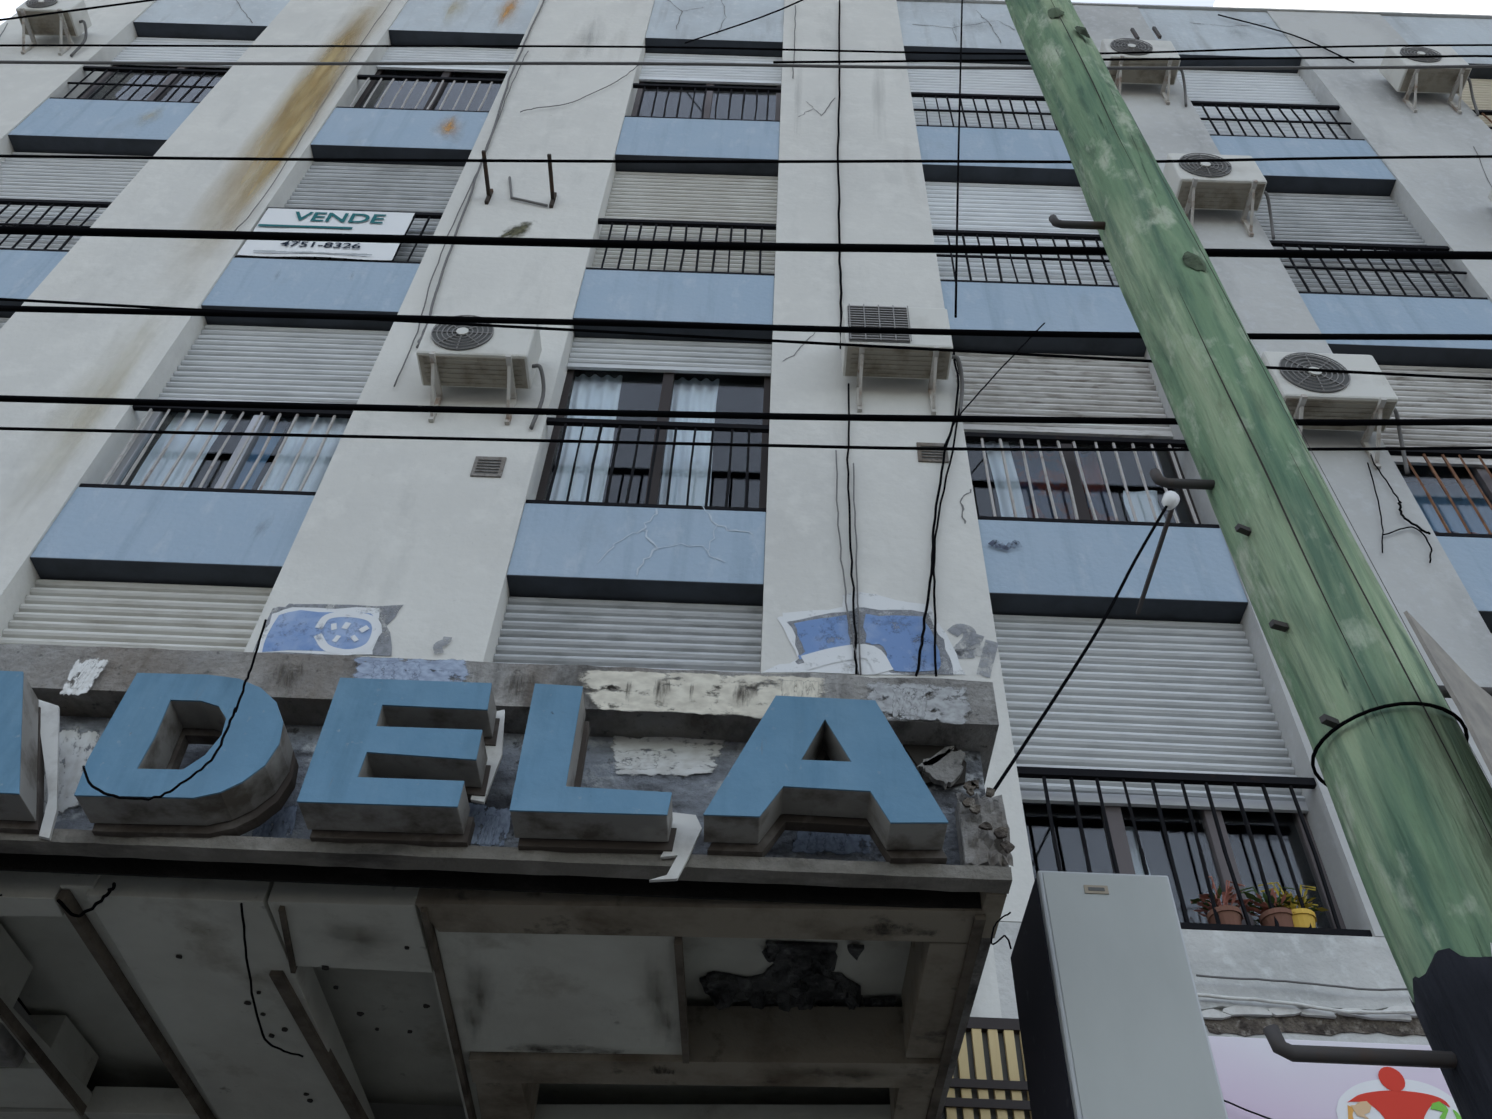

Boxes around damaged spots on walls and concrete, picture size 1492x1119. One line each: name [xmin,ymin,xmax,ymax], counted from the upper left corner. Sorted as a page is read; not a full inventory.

crack [668,0,726,34]
rust [240,33,358,197]
crack [598,506,752,575]
peeling [866,682,972,724]
peeling [611,736,724,776]
spalling [903,744,1015,854]